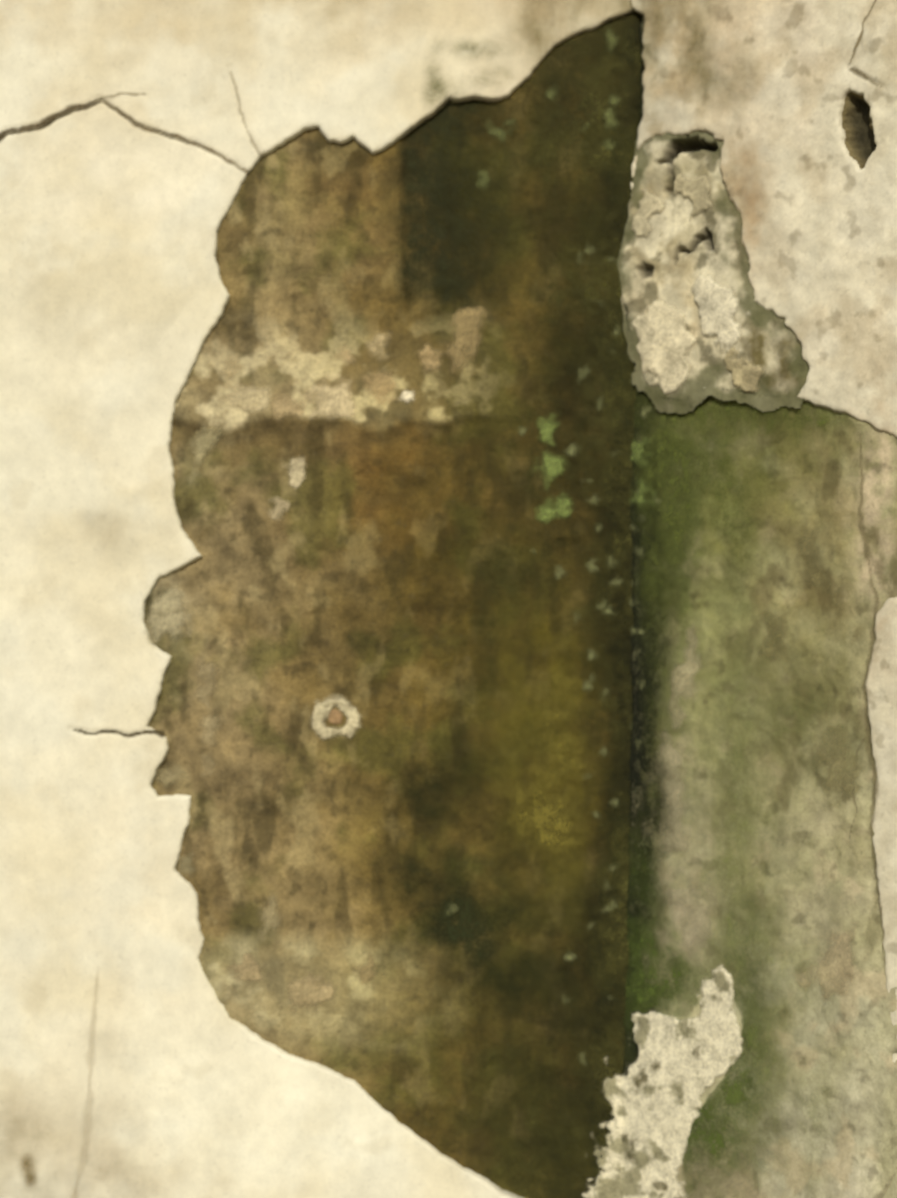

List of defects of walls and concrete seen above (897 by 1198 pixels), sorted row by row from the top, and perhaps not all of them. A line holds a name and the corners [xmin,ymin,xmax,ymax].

crack [0,93,247,171]
spalling [842,92,876,169]
spalling [144,12,638,1198]
peeling [583,131,897,1198]
crack [74,729,164,737]